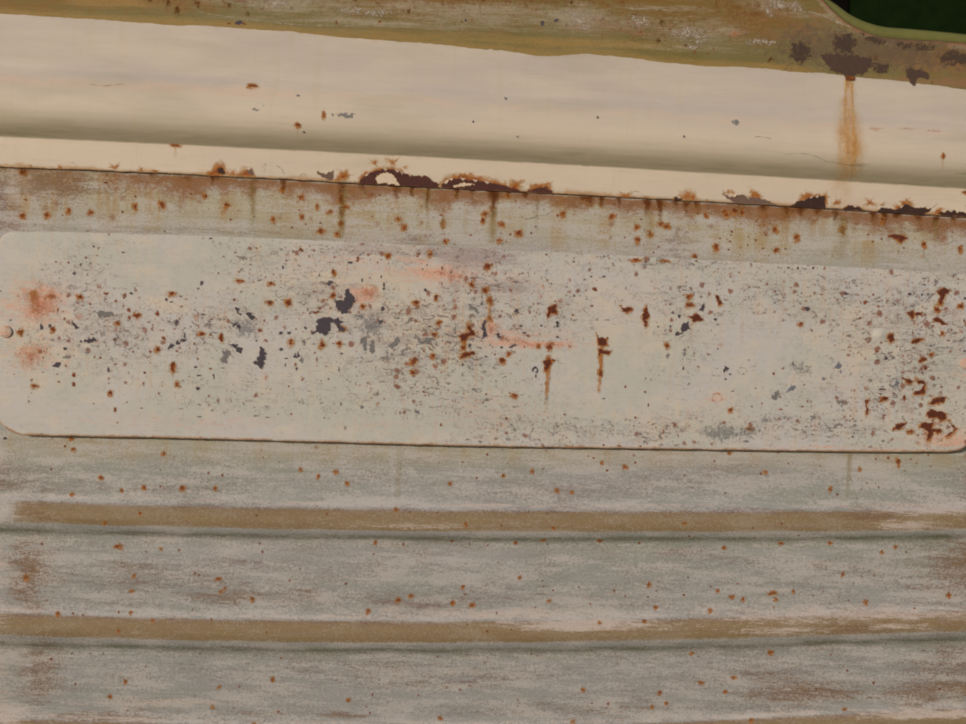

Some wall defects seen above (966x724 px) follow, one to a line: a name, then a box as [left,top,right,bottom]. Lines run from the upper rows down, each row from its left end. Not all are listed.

peeling [789,33,966,81]
peeling [316,167,552,193]
rust [480,180,550,244]
rust [624,191,800,263]
peeling [790,193,827,208]
rust [783,193,847,235]
rust [865,199,963,254]
peeling [877,201,966,217]
peeling [253,340,267,369]
peeling [279,289,357,370]
rust [596,332,610,392]
rust [856,352,963,471]